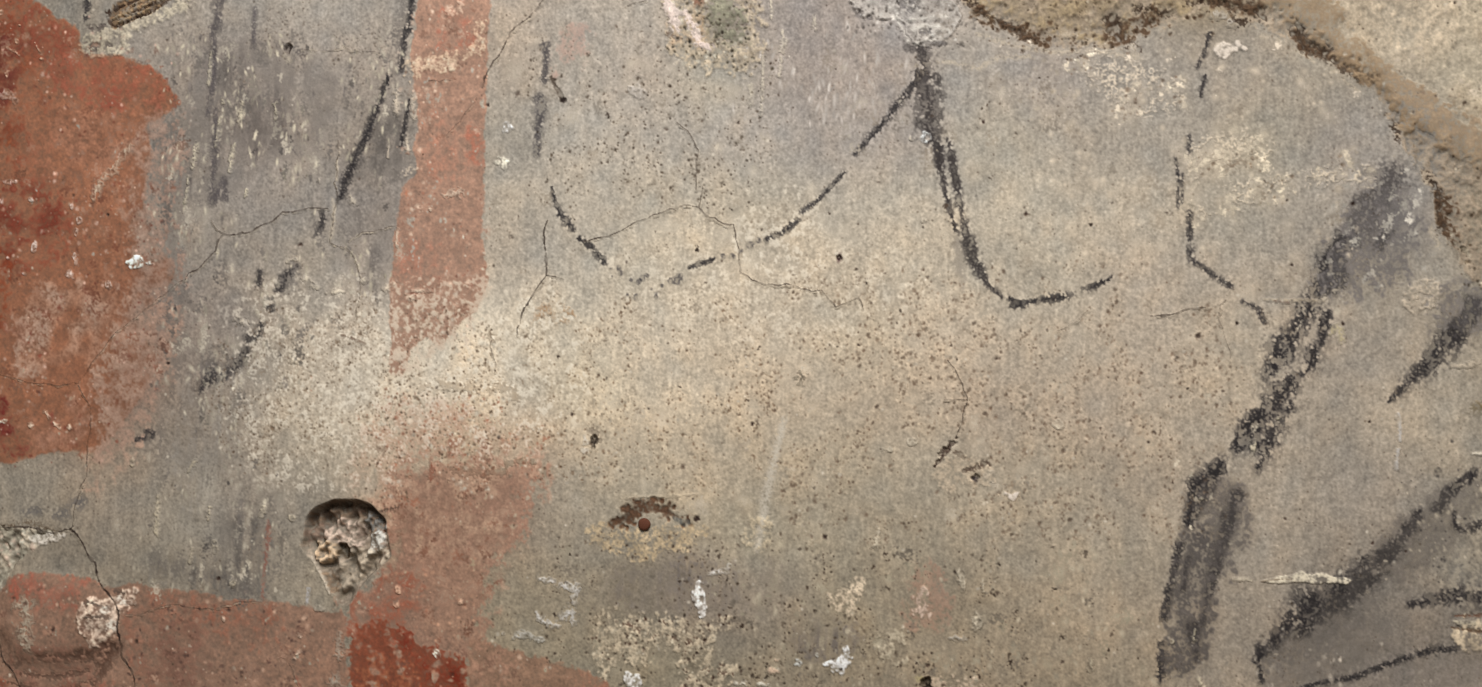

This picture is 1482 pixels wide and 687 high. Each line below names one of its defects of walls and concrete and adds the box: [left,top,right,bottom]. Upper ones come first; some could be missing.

crack [583,121,864,311]
crack [489,218,565,375]
crack [0,139,399,687]
peeling [10,594,37,654]
spalling [0,516,67,589]
spalling [286,497,402,613]